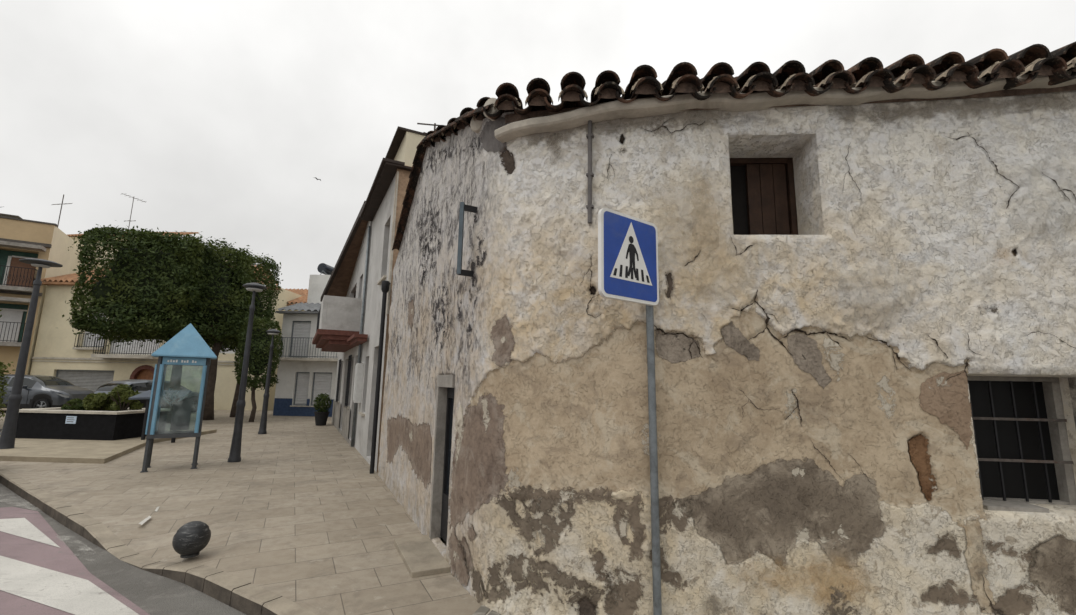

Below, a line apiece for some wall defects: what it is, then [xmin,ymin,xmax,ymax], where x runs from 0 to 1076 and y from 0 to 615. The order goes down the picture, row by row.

damp [420,138,480,176]
spalling [500,148,516,175]
crack [945,132,1019,209]
damp [417,201,442,282]
damp [431,211,486,356]
peeling [387,414,432,489]
peeling [448,297,1076,615]